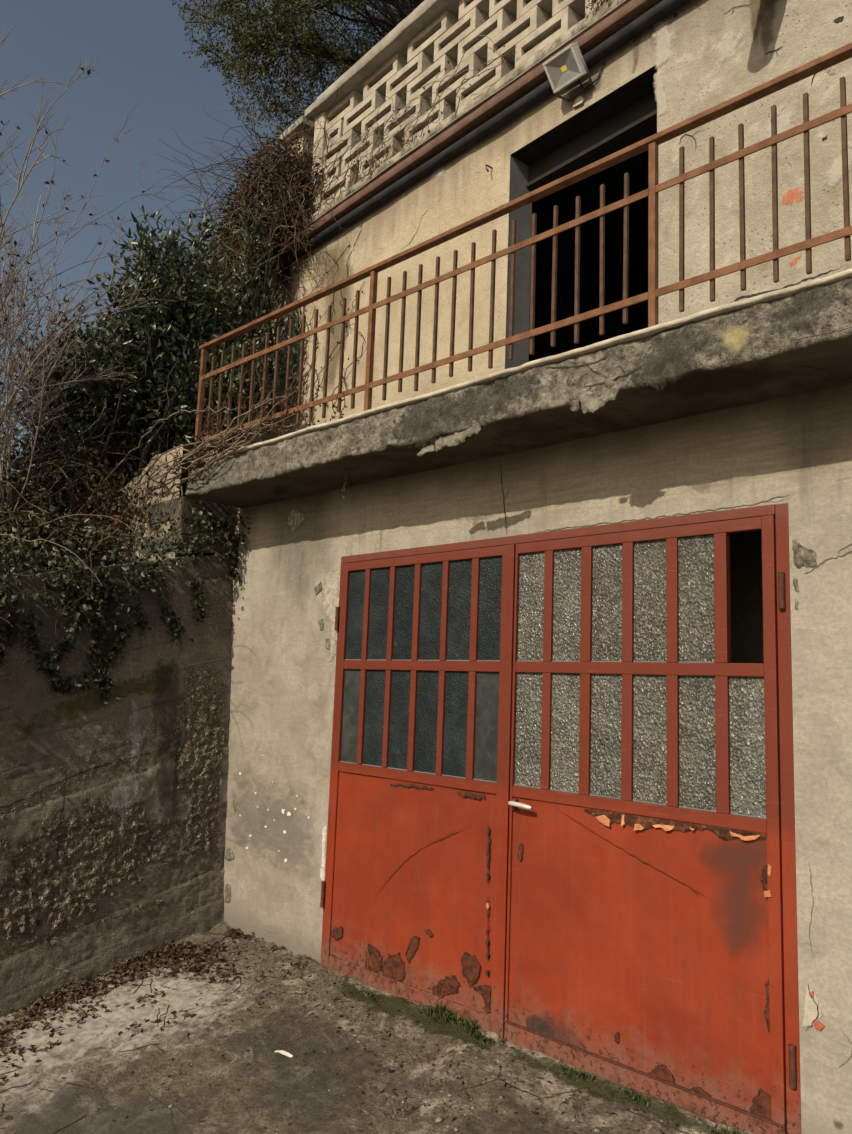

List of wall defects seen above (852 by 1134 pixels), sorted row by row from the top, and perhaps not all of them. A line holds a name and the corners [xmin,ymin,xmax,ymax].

water stain [750,0,775,47]
spalling [724,326,749,350]
spalling [569,378,618,413]
spalling [417,425,481,457]
crack [500,456,787,535]
crack [804,544,852,574]
crack [0,714,178,859]
peeling [584,809,767,841]